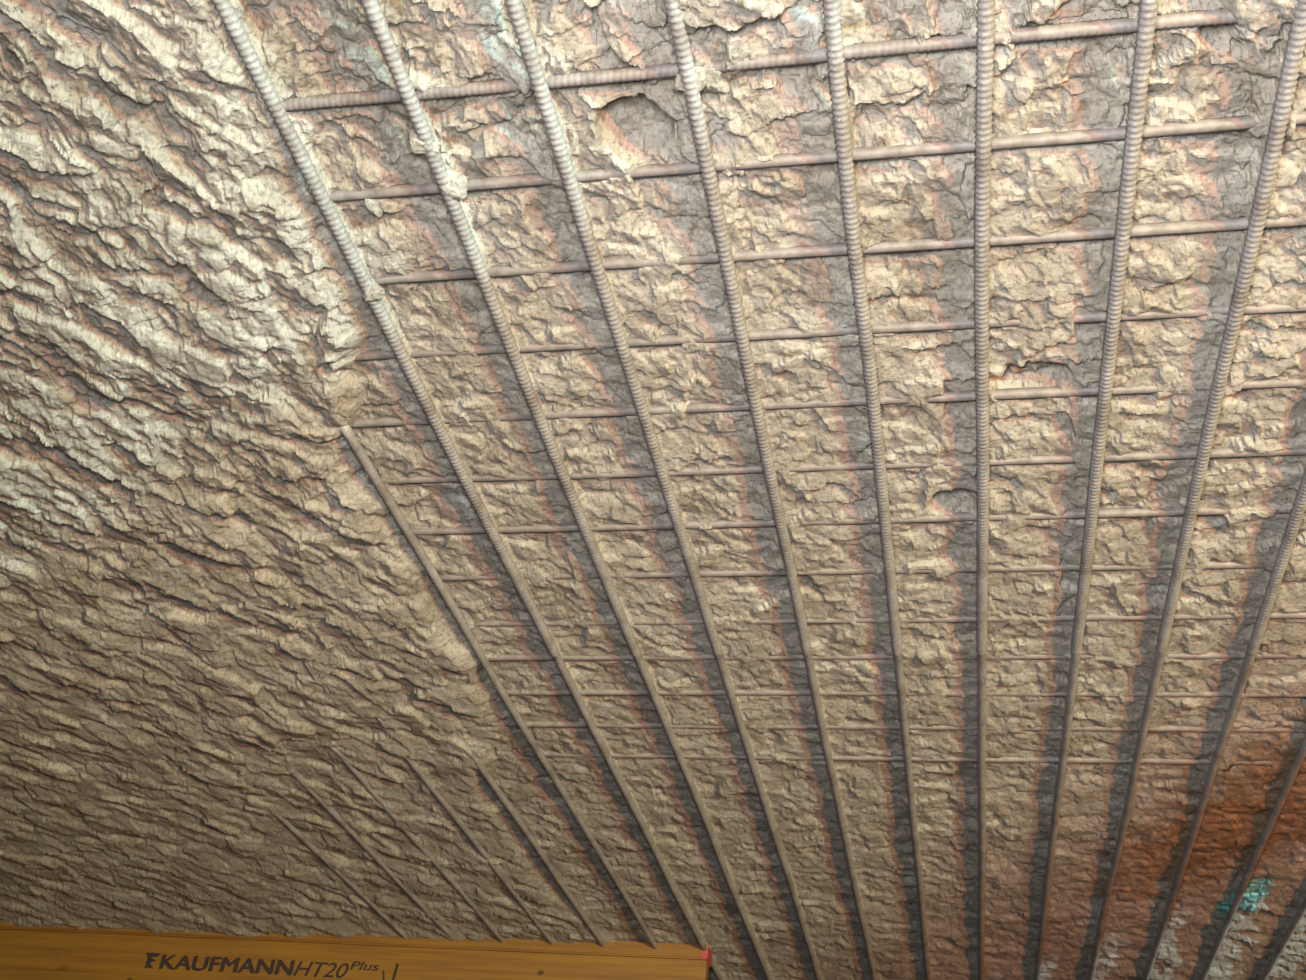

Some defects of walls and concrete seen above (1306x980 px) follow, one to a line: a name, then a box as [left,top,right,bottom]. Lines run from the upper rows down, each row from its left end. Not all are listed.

spalling [991,0,1141,137]
spalling [1131,0,1298,224]
spalling [0,0,979,980]
spalling [984,43,1306,980]
damp [1209,877,1276,916]